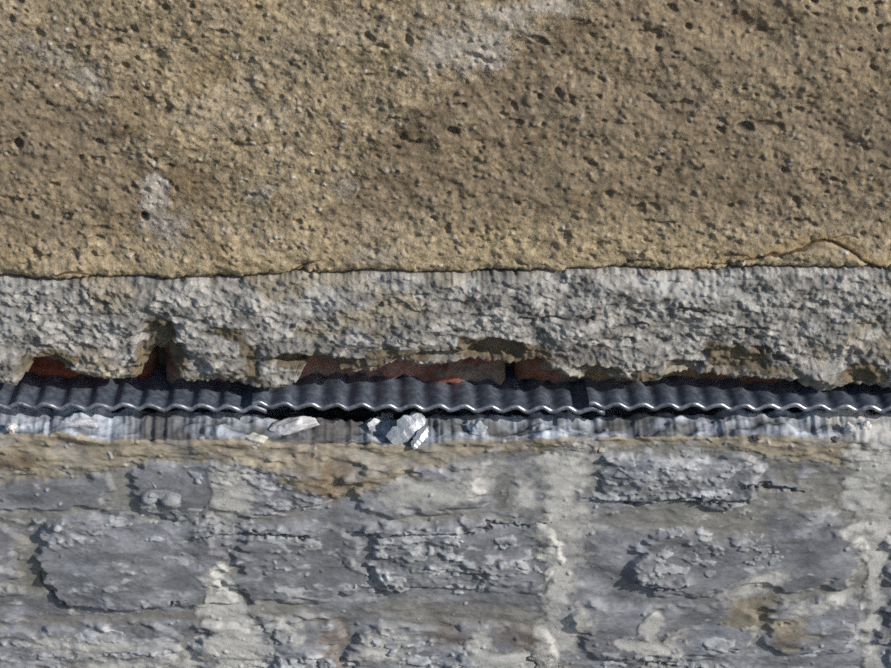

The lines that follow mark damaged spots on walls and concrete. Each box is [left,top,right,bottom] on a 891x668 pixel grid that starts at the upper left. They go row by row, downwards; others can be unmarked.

leakage [419,0,580,75]
leakage [136,172,189,255]
crack [713,233,868,265]
flaking render [21,349,93,379]
spalling [116,318,193,384]
flaking render [214,327,785,385]
spalling [840,363,889,383]
leakage [208,468,258,535]
leakage [377,468,494,513]
leakage [448,439,605,668]
leakage [783,408,891,668]
leakage [18,563,306,668]